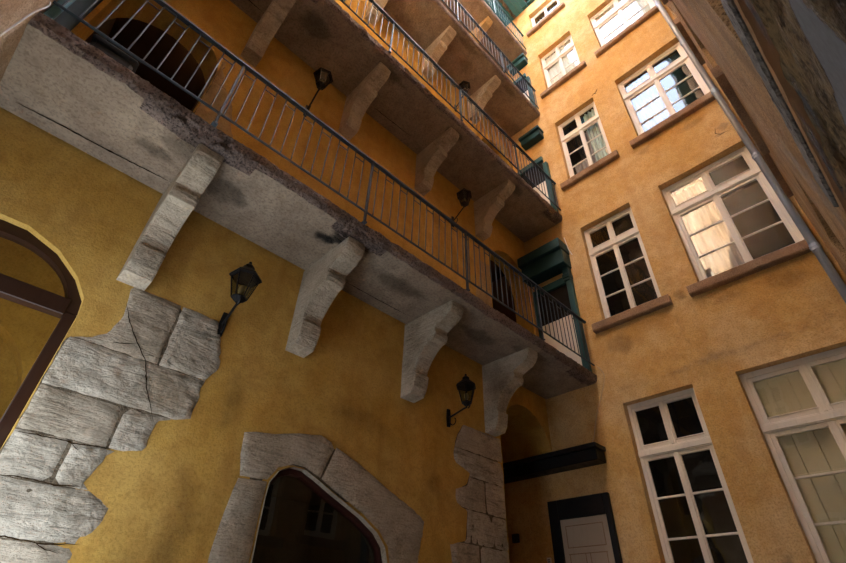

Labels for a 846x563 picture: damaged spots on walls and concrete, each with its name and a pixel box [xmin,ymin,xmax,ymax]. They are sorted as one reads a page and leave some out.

flaking render [0,287,221,563]
crack [113,308,153,419]
flaking render [450,425,510,563]